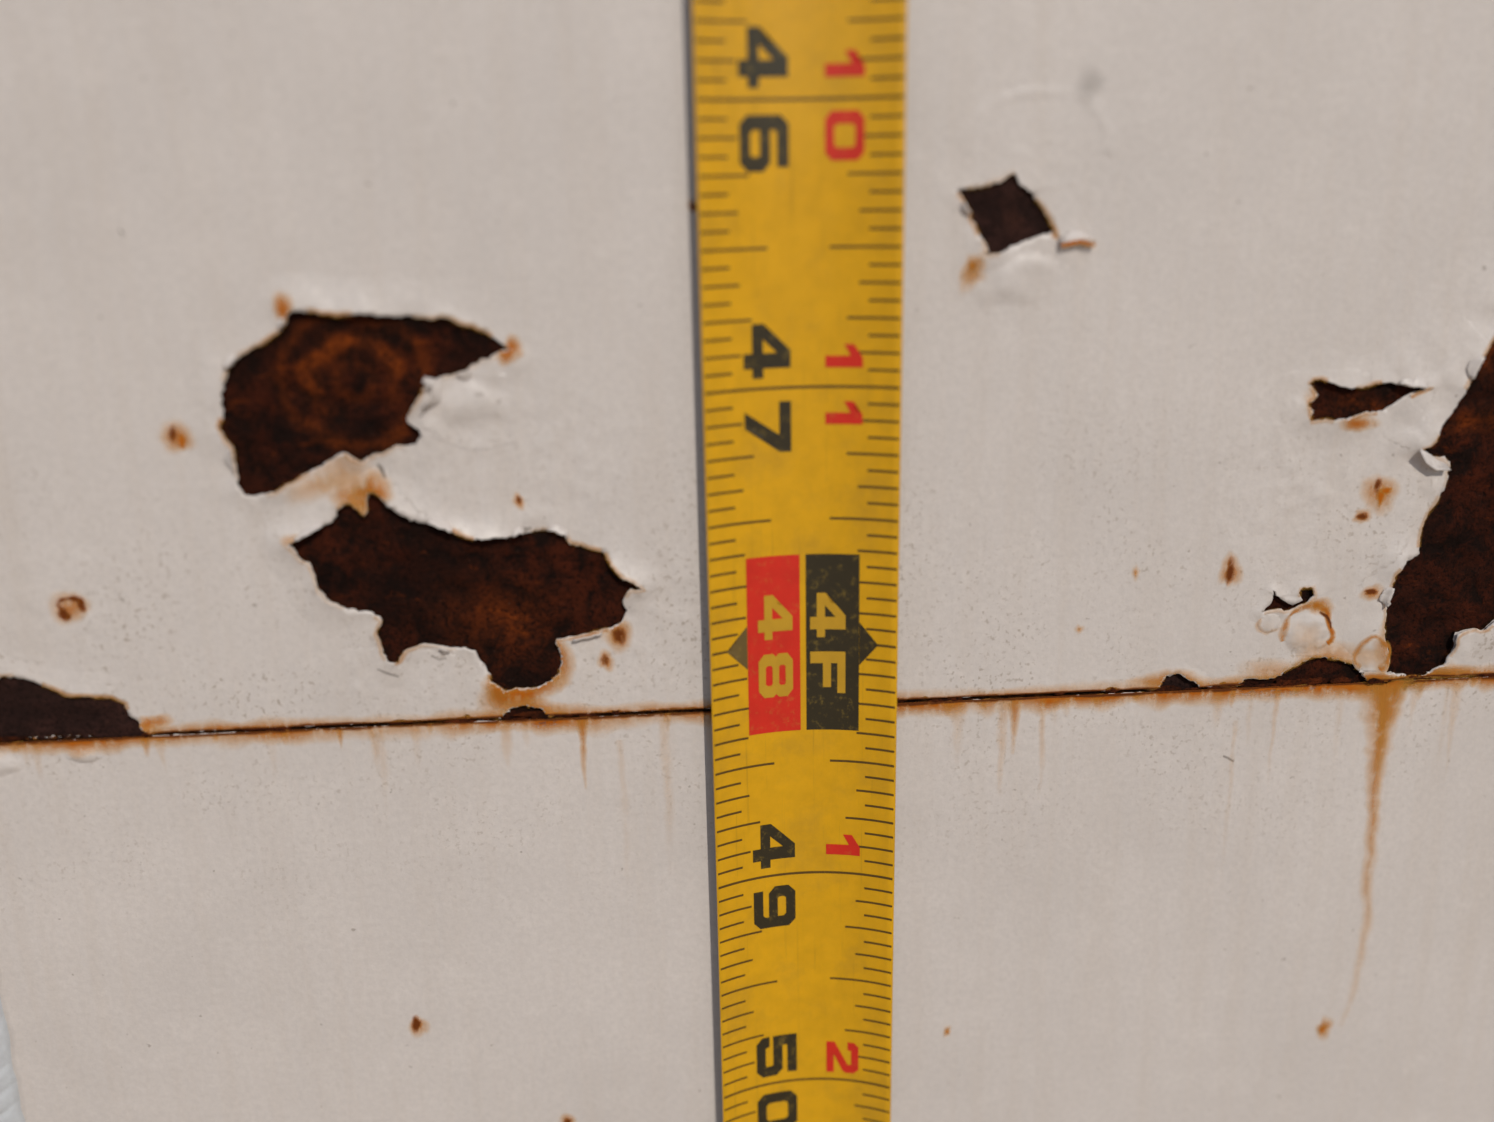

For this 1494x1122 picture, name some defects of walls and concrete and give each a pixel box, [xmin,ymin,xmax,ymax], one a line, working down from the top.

rust [167,427,187,448]
rust [57,596,86,621]
rust [602,626,626,667]
rust [0,705,712,752]
rust [897,670,1494,824]